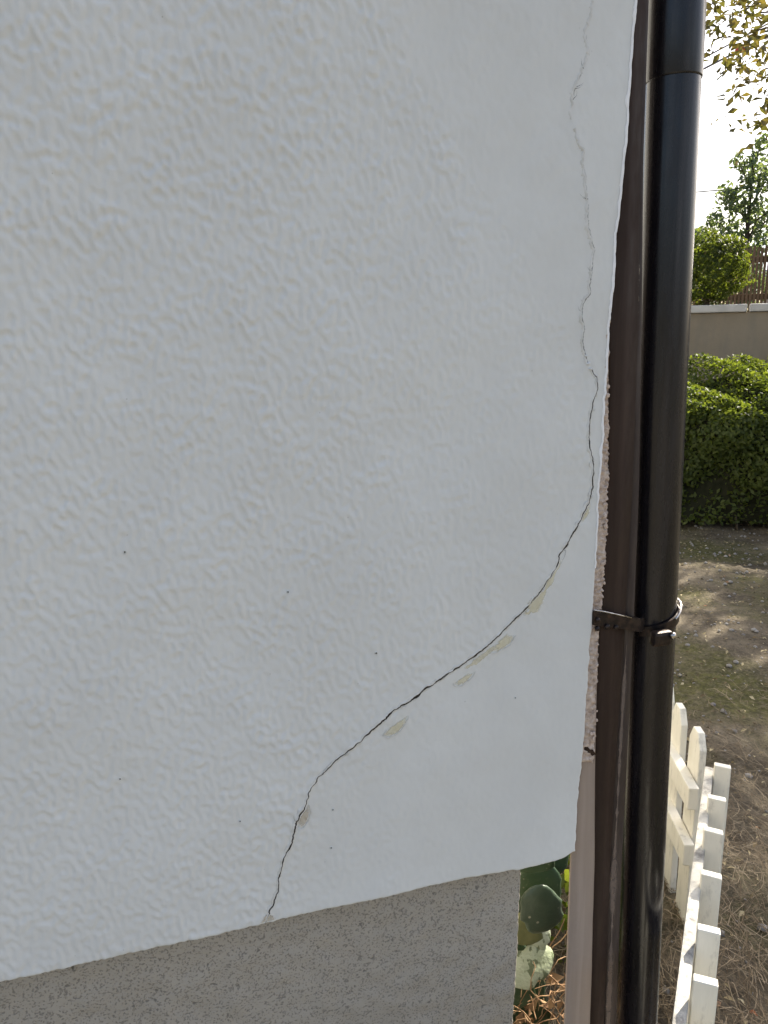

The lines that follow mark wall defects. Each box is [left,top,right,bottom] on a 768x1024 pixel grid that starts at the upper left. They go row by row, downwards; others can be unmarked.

crack [263,1,599,923]